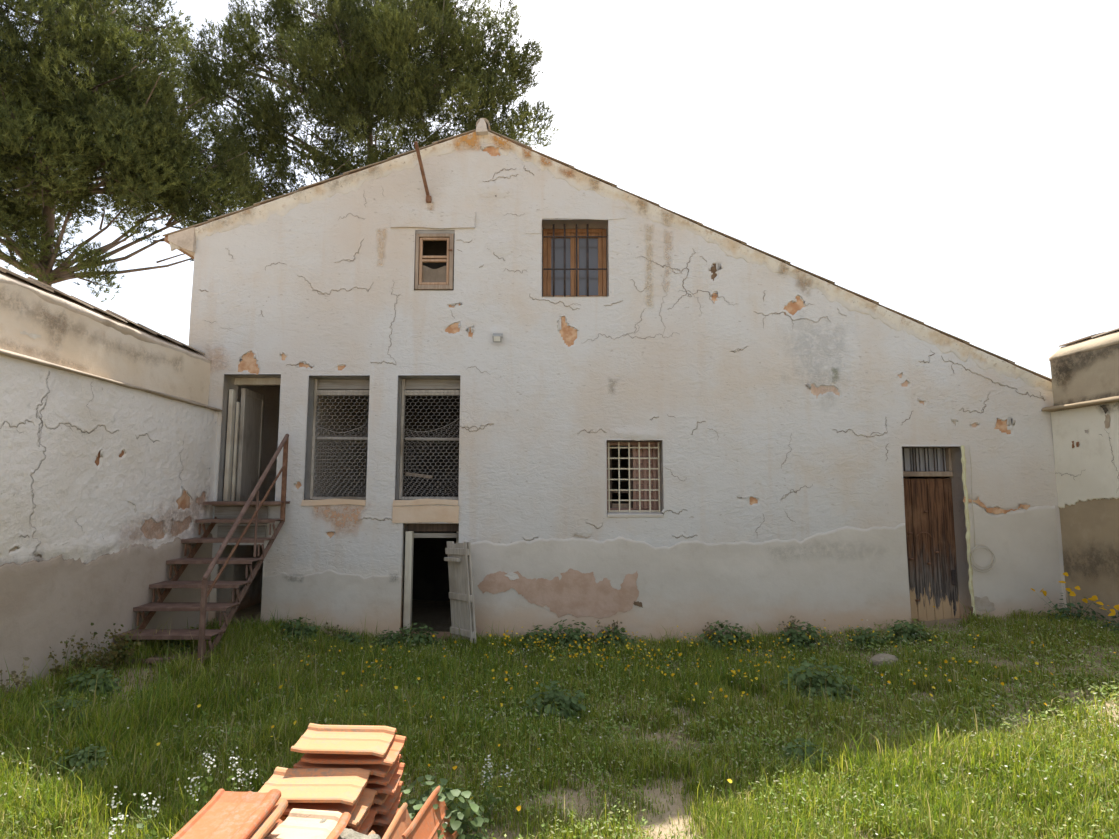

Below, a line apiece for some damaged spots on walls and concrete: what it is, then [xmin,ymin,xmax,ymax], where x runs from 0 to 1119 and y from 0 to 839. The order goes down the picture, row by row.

crack [265,187,399,365]
peeling [445,301,476,337]
peeling [557,314,579,347]
crack [455,238,847,353]
peeling [784,293,807,315]
peeling [238,349,259,375]
peeling [804,382,840,398]
peeling [994,416,1016,434]
crack [0,371,182,554]
peeling [140,484,208,540]
peeling [963,496,1030,514]
peeling [477,568,642,619]